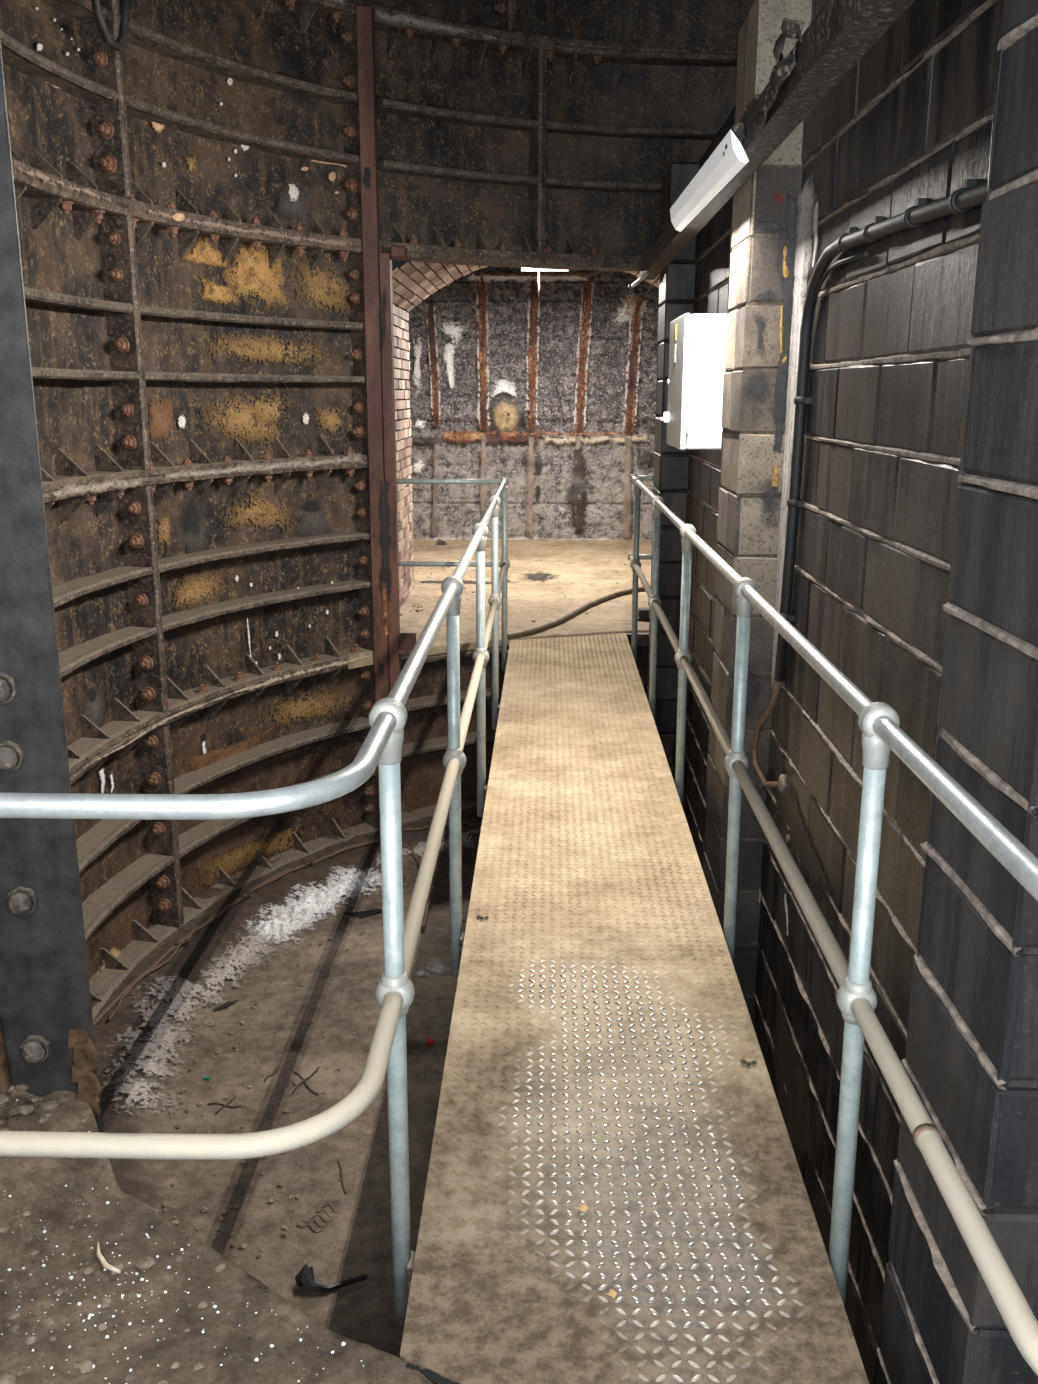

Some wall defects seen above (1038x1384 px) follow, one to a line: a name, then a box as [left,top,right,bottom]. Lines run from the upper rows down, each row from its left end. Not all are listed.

leakage [437,318,465,389]
corrosion [412,276,653,539]
corrosion [379,481,392,636]